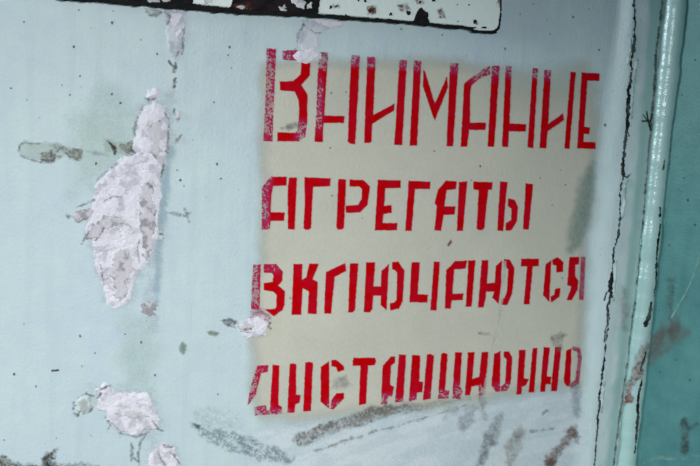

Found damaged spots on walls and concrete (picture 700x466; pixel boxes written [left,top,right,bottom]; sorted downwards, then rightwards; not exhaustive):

peeling [145,0,188,88]
peeling [293,19,345,64]
spalling [68,87,181,309]
crack [594,0,665,466]
spalling [140,299,158,322]
spalling [223,310,271,339]
spalling [74,382,182,466]